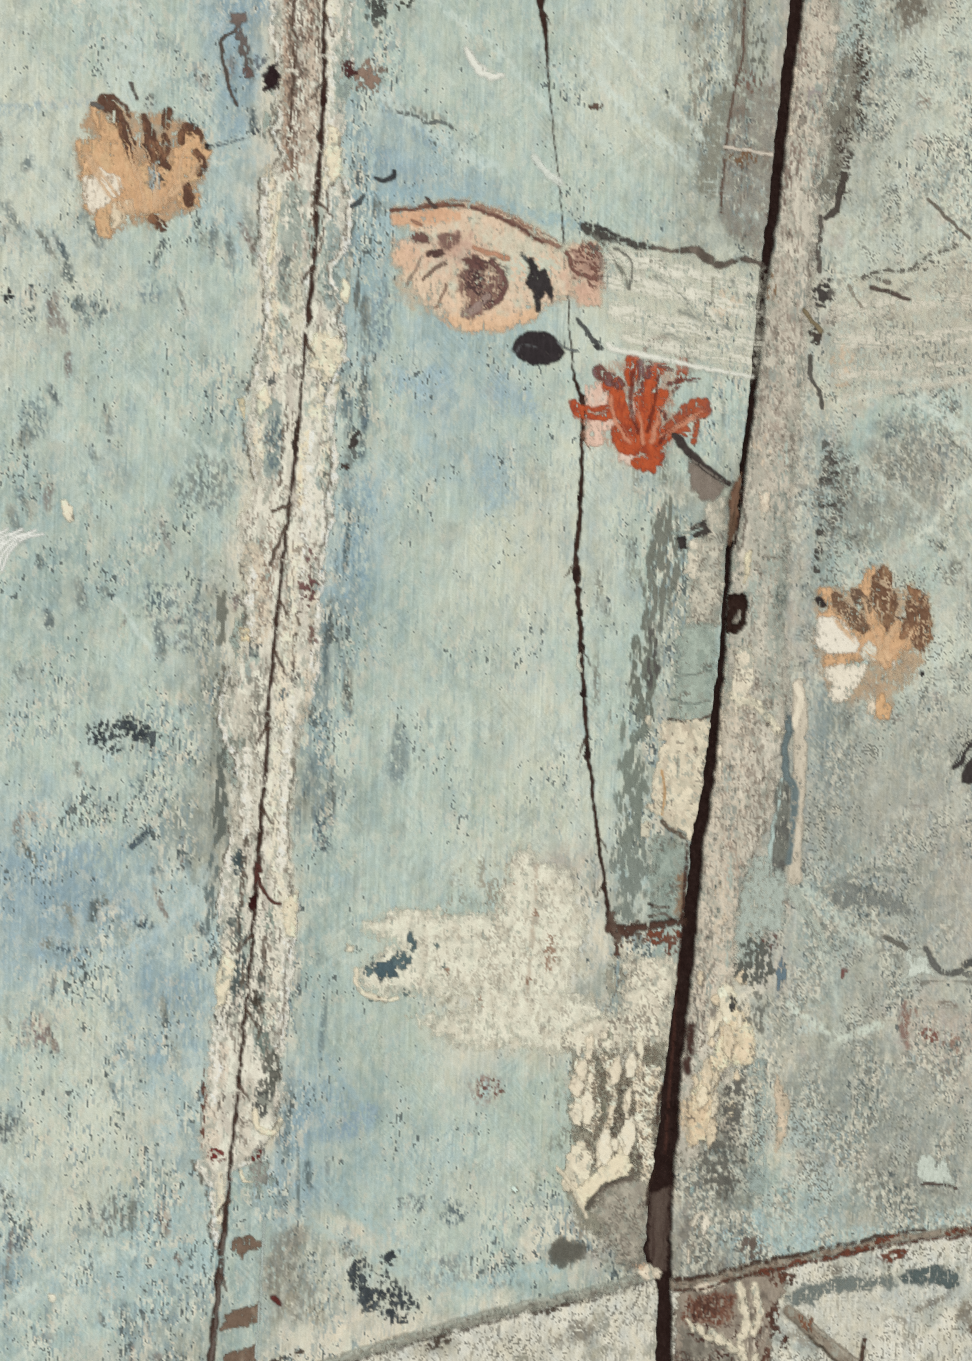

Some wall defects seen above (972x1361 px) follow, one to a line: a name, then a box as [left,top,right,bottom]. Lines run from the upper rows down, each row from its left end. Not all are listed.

crack [207,0,333,1361]
peeling [192,0,356,1249]
peeling [346,0,871,1268]
crack [271,0,972,1361]
rust [671,1270,796,1361]